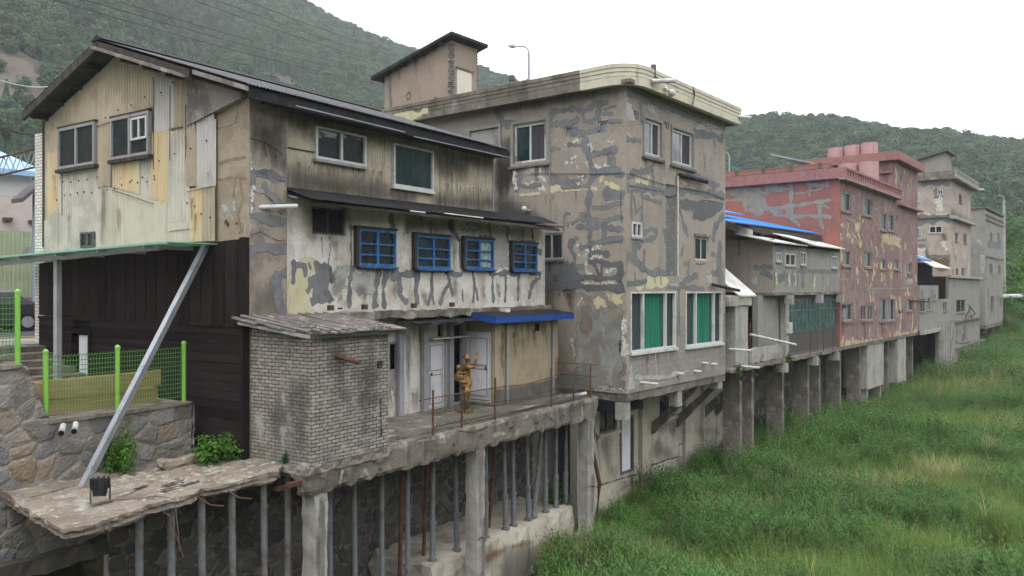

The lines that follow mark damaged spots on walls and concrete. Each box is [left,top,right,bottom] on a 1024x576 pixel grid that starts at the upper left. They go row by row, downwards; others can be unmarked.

peeling [564,138,607,192]
peeling [224,185,256,237]
peeling [840,205,926,347]